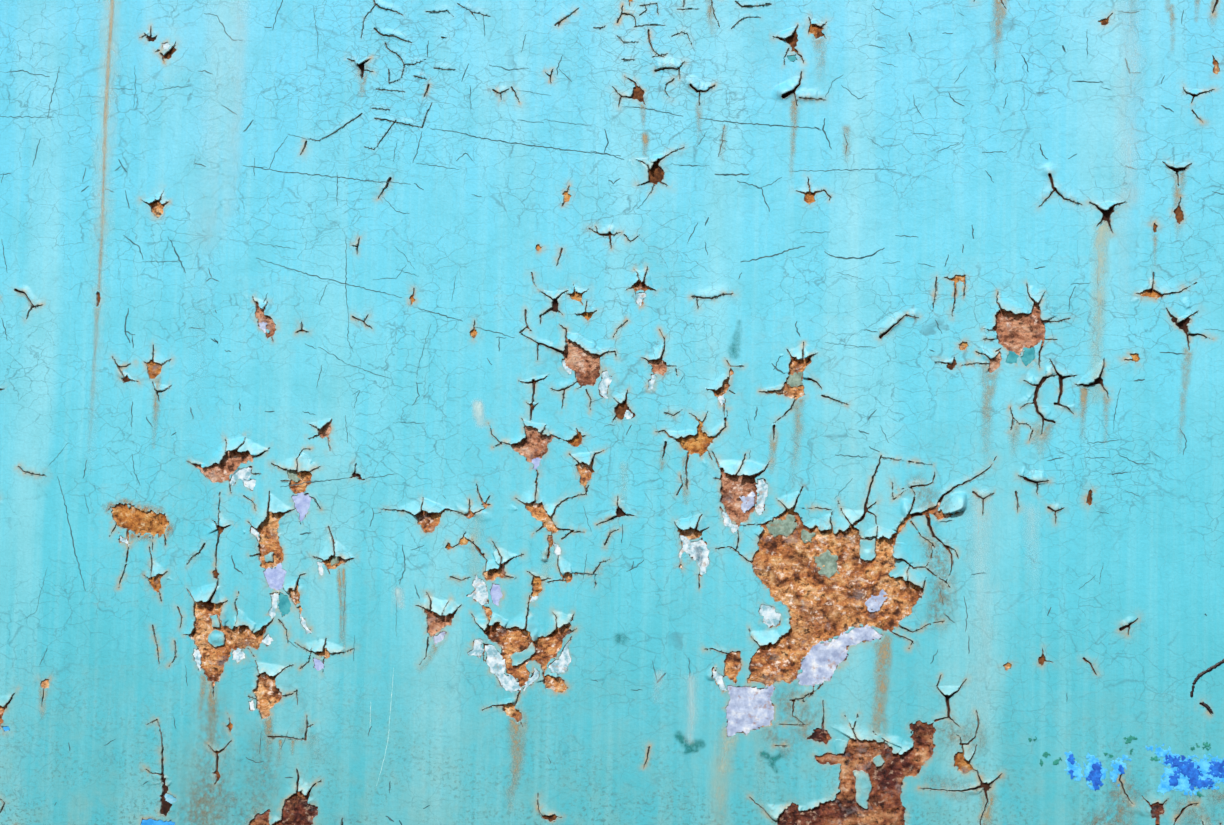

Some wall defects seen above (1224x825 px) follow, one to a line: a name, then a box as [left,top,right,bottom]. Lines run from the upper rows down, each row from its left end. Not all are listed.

crack [221,0,896,214]
crack [1039,143,1125,233]
peeling [968,287,1070,373]
crack [1135,274,1220,355]
crack [523,376,635,435]
rust [109,500,170,583]
peeling [184,438,353,719]
peeling [420,420,600,724]
peeling [659,361,988,737]
rust [752,638,944,825]
rust [247,769,321,825]
rust [1142,796,1176,825]